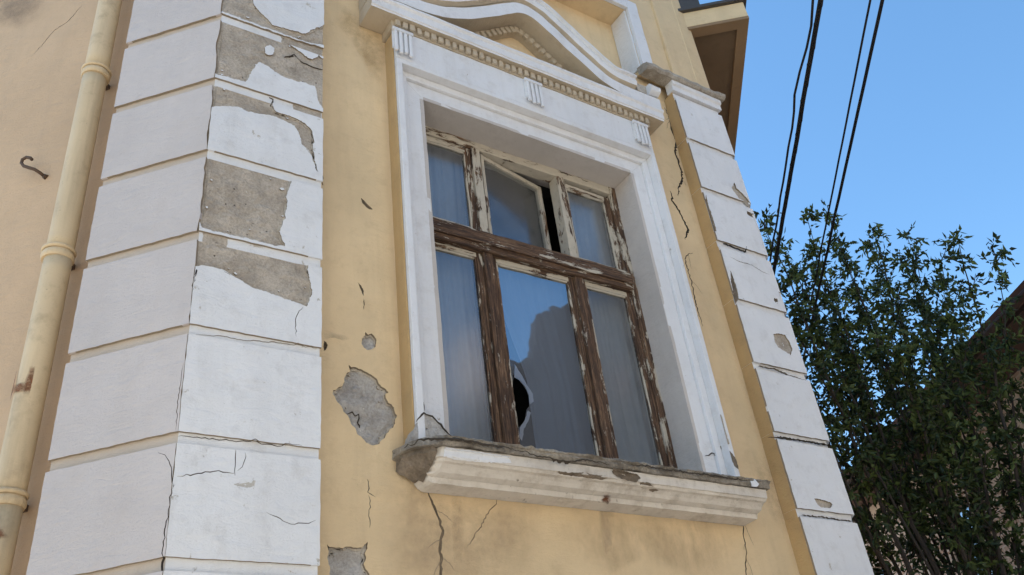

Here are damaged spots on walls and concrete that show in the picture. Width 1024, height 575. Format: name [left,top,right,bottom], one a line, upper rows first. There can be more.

spalling [215,0,323,169]
spalling [199,159,312,306]
crack [665,109,702,322]
rust [11,371,33,394]
crack [160,368,285,571]
spalling [333,368,396,445]
spalling [362,335,375,350]
spalling [396,402,451,482]
spalling [774,334,791,354]
spalling [327,544,368,575]
crack [428,493,497,575]